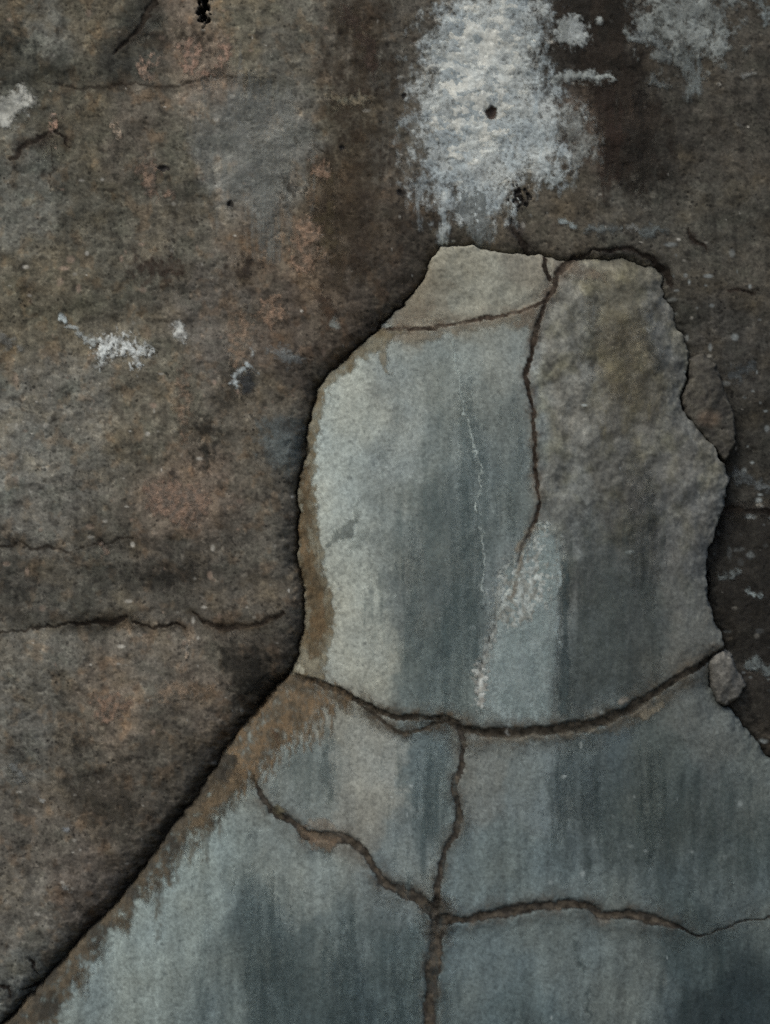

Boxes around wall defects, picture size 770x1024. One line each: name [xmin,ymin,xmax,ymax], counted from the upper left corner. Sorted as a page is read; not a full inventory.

water stain [399,0,745,247]
spalling [257,294,285,327]
spalling [290,215,321,273]
crack [384,218,674,562]
crack [687,228,707,250]
crack [0,611,285,634]
spalling [143,479,212,527]
crack [454,354,511,695]
water stain [472,522,631,720]
water stain [711,509,770,713]
crack [723,506,770,516]
crack [254,645,770,1024]